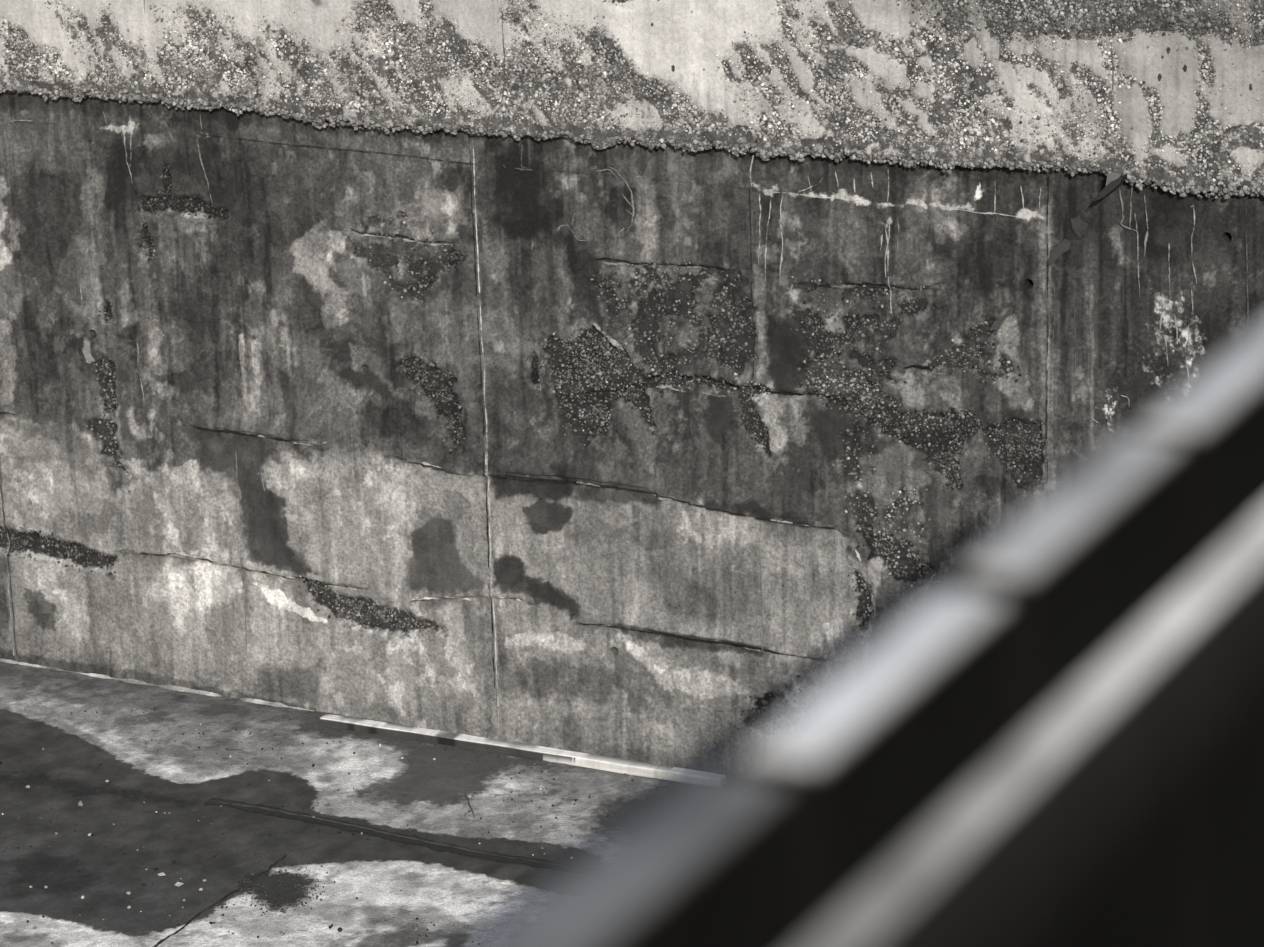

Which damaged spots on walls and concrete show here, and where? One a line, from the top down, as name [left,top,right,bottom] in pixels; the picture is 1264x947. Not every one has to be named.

spalling [0,0,1264,200]
spalling [133,166,233,265]
spalling [522,262,774,457]
spalling [86,358,128,473]
spalling [784,276,1050,589]
spalling [0,527,119,573]
crack [118,548,368,592]
spalling [291,575,448,638]
leakage [406,517,484,593]
leakage [494,555,579,616]
leakage [0,709,593,936]
leakage [591,782,678,833]